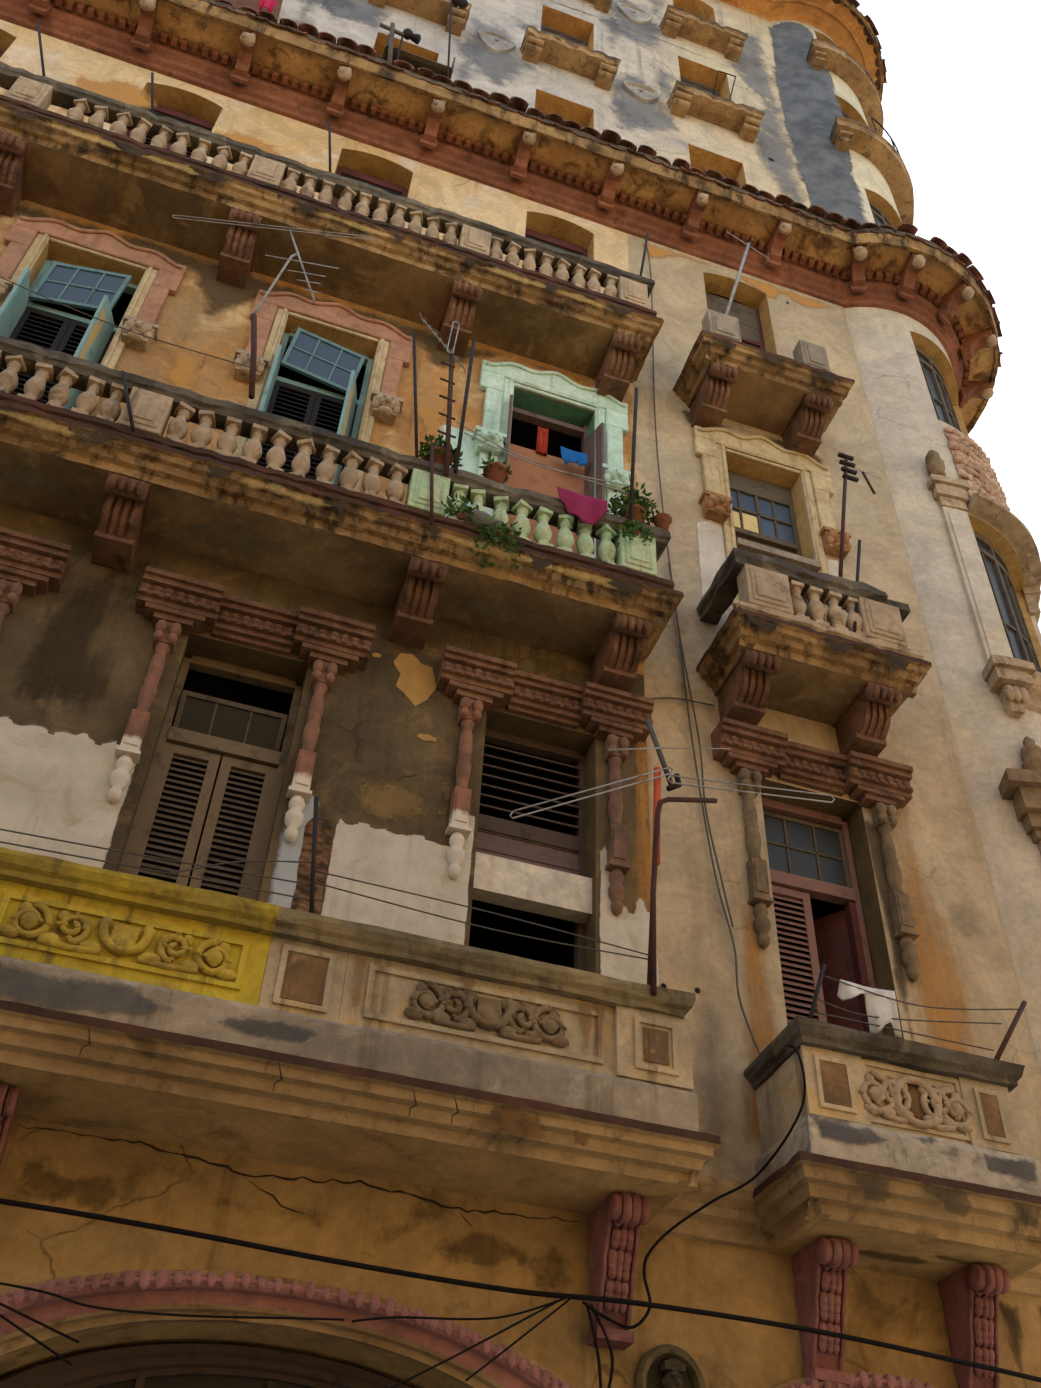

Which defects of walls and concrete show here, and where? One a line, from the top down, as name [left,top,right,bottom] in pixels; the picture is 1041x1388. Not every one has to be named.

water stain [733,22,867,224]
peeling [372,652,436,706]
peeling [417,733,437,742]
peeling [0,717,136,868]
peeling [270,796,475,945]
peeling [599,846,659,986]
water stain [0,963,172,1013]
water stain [224,1019,313,1041]
water stain [819,1118,885,1145]
crack [20,1125,579,1228]
water stain [984,1154,1037,1180]